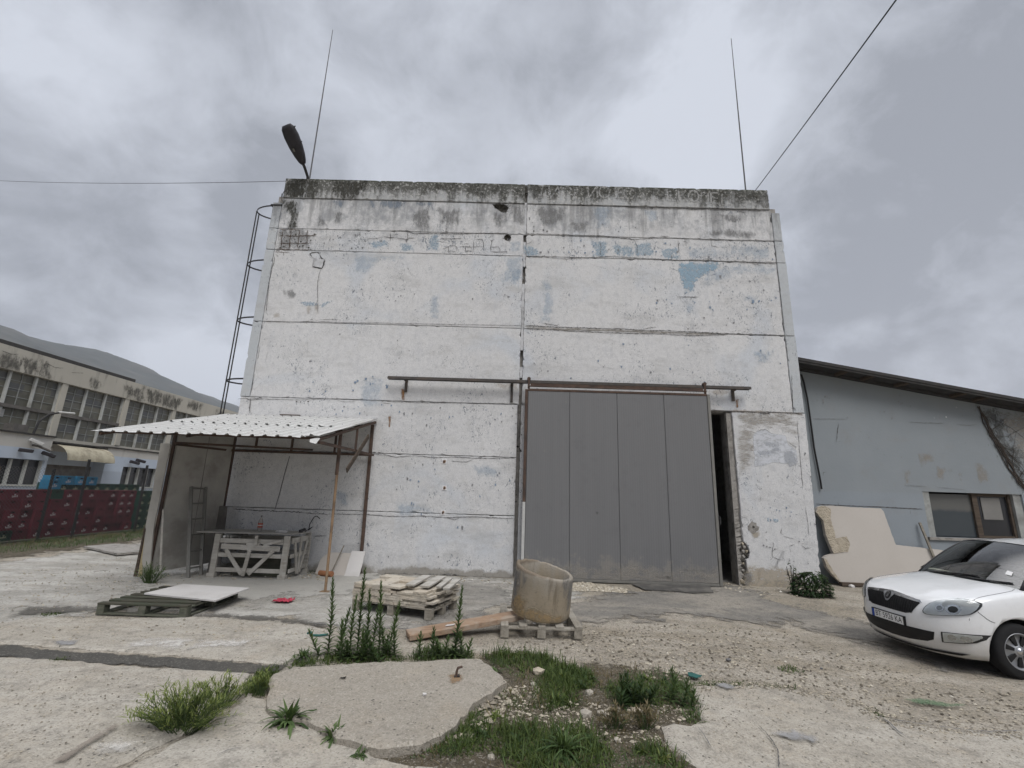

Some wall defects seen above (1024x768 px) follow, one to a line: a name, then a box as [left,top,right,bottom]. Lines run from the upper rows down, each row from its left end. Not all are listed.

leakage [280,179,318,248]
leakage [332,180,401,221]
leakage [414,183,769,237]
peeling [750,421,806,466]